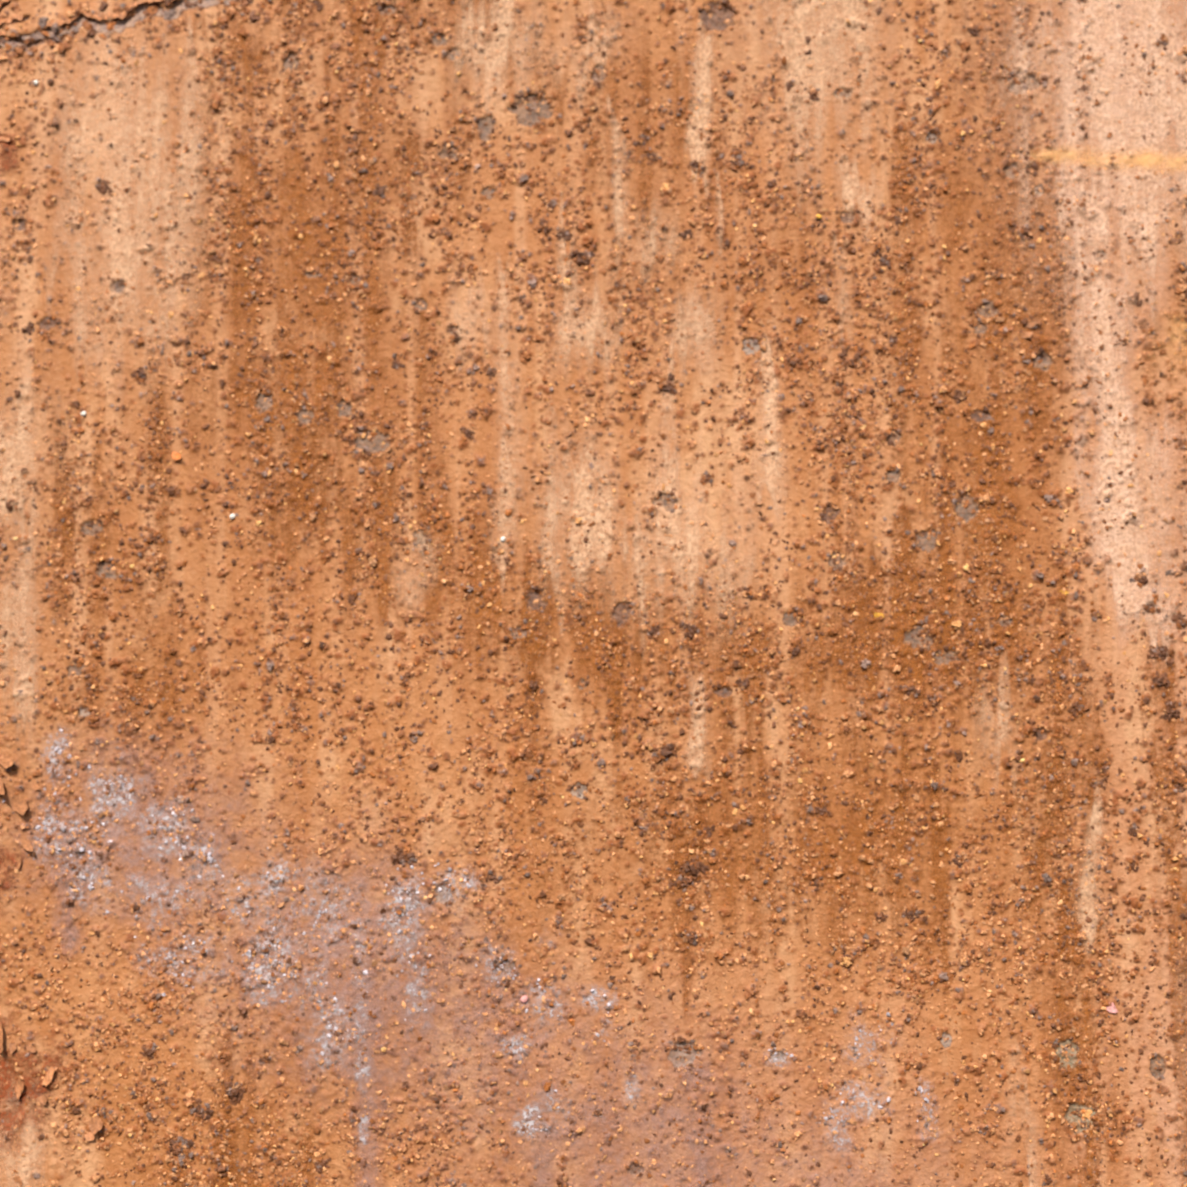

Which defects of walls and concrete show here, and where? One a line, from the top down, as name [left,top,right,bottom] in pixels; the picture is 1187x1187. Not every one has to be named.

crack [0,0,350,78]
peeling [0,751,28,816]
peeling [0,836,33,889]
leakage [22,726,473,1077]
peeling [0,1021,68,1142]
leakage [475,946,561,1025]
leakage [568,988,618,1047]
leakage [763,1043,793,1070]
leakage [814,1012,894,1145]
peeling [84,1115,103,1141]
leakage [359,1091,376,1187]
leakage [513,1076,707,1187]